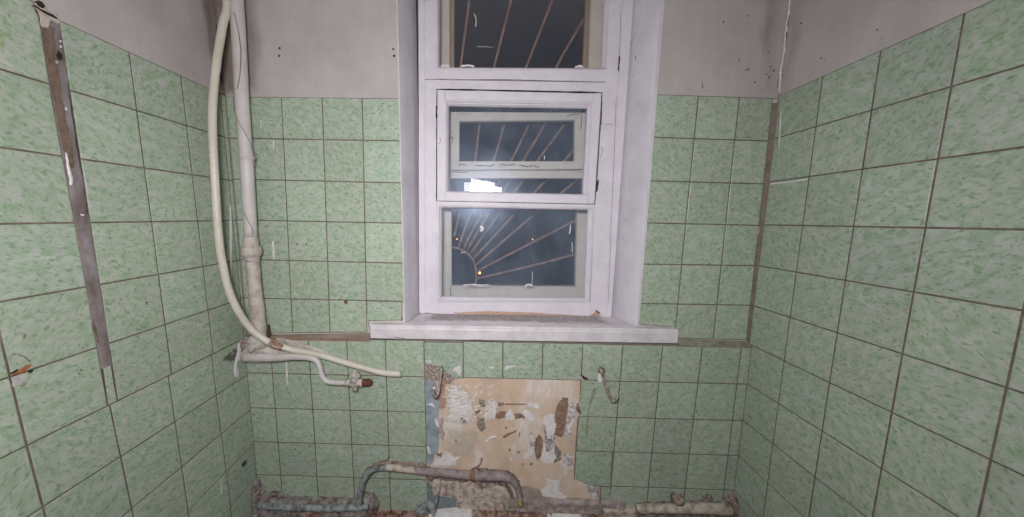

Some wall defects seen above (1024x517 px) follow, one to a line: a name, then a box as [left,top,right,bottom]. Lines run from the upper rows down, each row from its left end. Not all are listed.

flaking render [414,365,603,515]